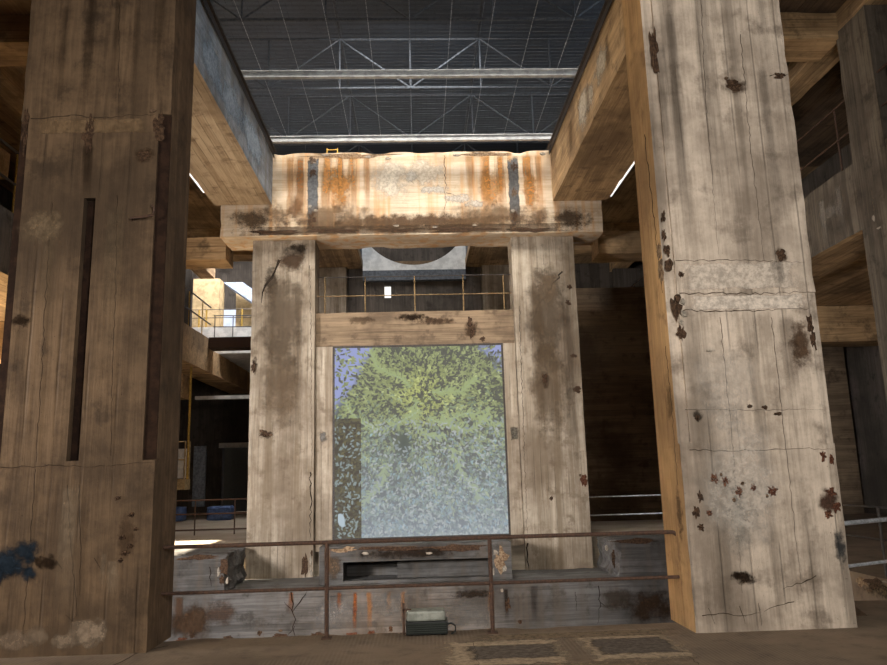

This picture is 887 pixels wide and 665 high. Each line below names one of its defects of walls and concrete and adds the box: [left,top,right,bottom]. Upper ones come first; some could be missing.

corrosion [288,159,304,217]
corrosion [322,158,368,207]
corrosion [481,157,504,203]
corrosion [523,157,536,209]
damp [236,160,590,366]
damp [530,271,567,421]
spalling [164,538,677,642]